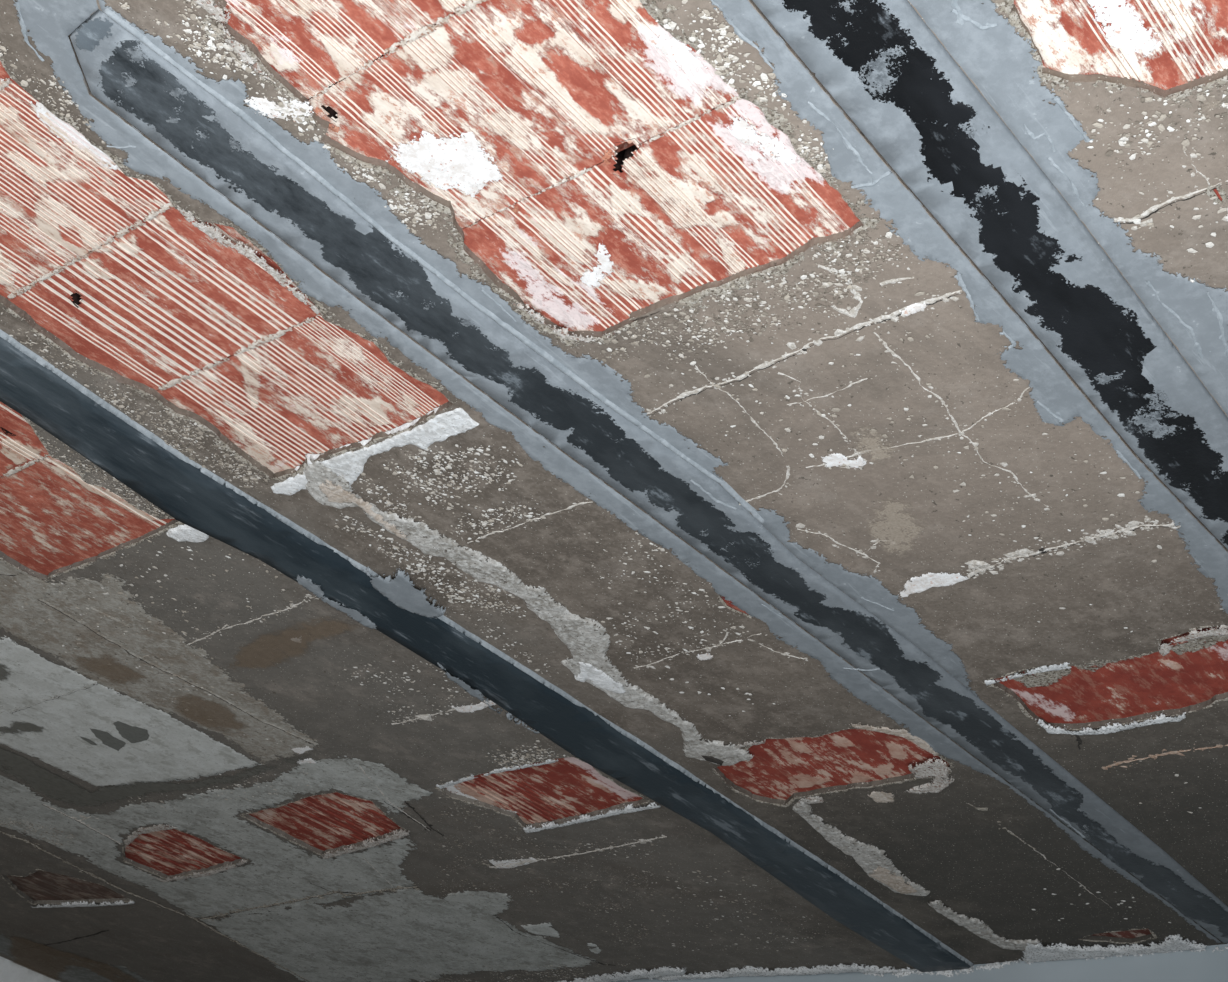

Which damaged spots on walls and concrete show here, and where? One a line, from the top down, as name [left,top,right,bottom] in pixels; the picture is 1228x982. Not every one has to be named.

spalling [193,0,880,349]
crack [1113,151,1228,231]
spalling [782,0,1228,545]
crack [642,265,1050,510]
crack [796,517,1181,598]
spalling [982,625,1228,735]
spalling [1,869,135,908]
spalling [122,824,250,883]
spalling [240,791,410,859]
spalling [435,756,661,833]
spalling [712,723,955,807]
peeling [554,928,1228,982]